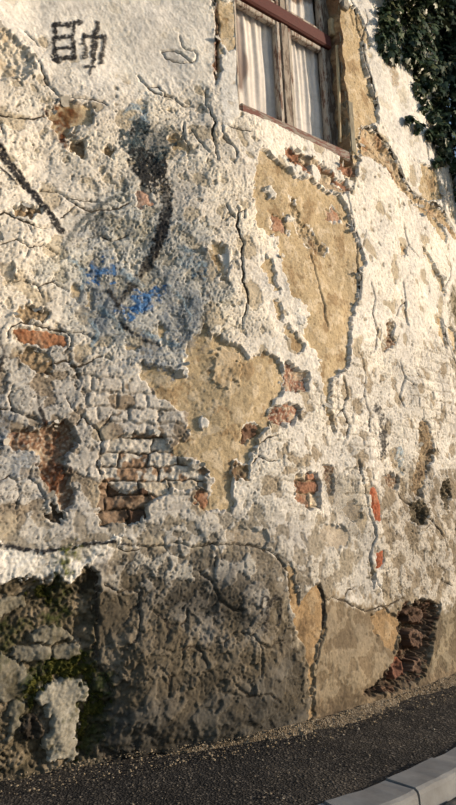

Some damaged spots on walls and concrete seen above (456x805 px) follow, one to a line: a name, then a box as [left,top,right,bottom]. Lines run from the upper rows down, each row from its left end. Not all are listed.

crack [0,32,106,134]
crack [138,0,251,157]
crack [226,205,249,320]
spalling [252,5,456,432]
flaking render [13,304,67,378]
spalling [3,419,78,511]
spalling [96,326,307,527]
spalling [410,420,439,496]
crack [315,463,402,662]
flaking render [0,624,89,764]
spalling [284,562,325,721]
spalling [363,599,441,696]